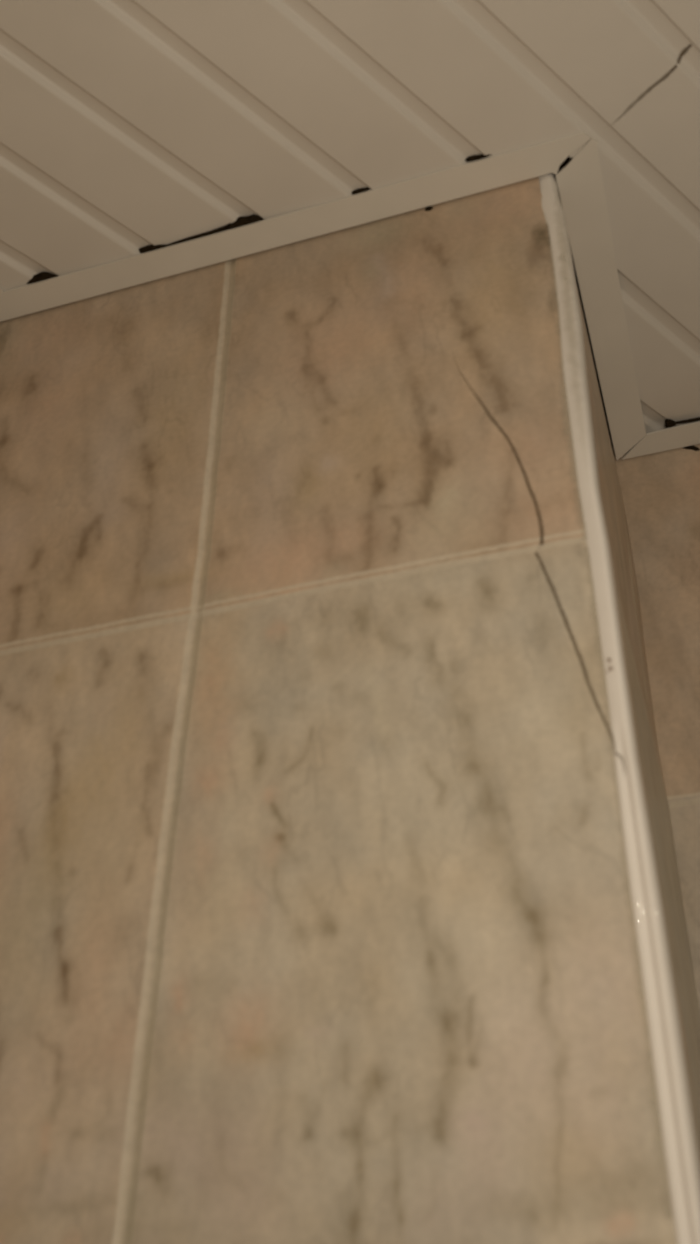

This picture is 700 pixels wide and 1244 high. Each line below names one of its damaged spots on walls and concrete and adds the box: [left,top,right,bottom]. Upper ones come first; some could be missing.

crack [647,44,692,92]
crack [501,430,584,668]